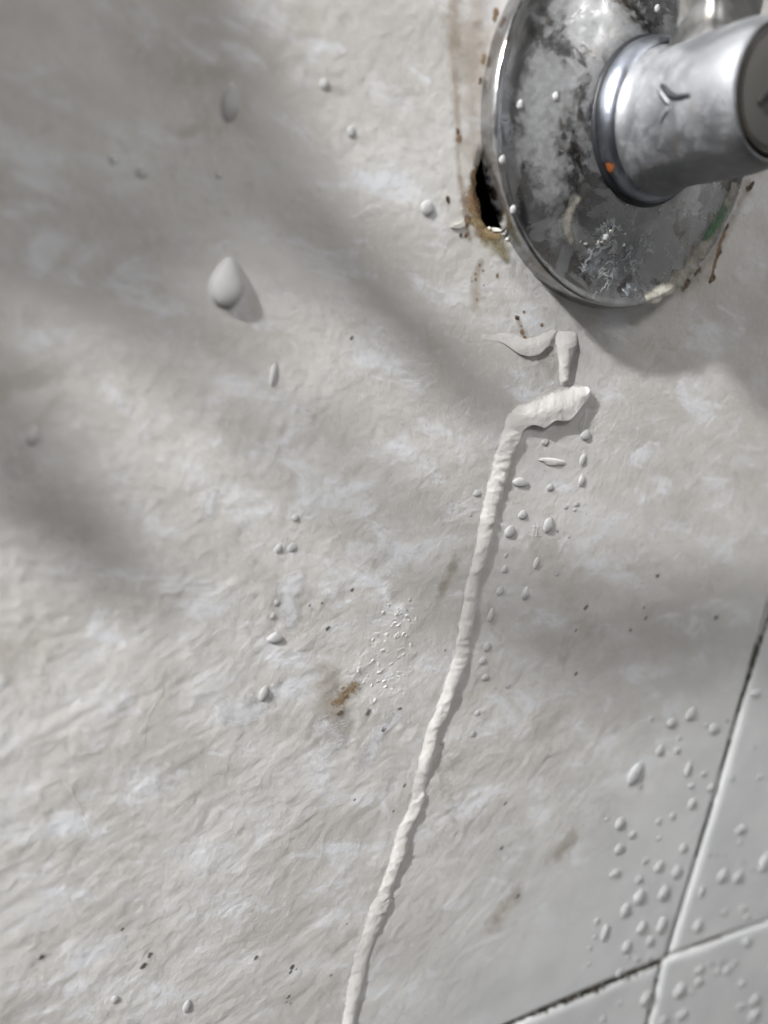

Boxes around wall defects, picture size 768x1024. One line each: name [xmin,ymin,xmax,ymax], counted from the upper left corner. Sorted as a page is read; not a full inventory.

rust [459,167,508,261]
spalling [470,159,509,241]